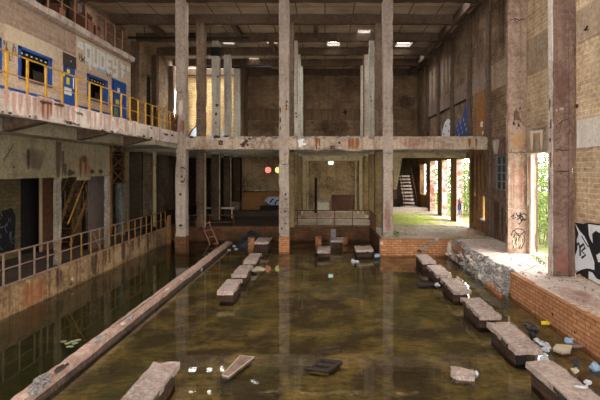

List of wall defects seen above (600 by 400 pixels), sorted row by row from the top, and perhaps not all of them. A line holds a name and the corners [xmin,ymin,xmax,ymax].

rust [37,95,54,122]
rust [346,136,361,151]
peeling [510,99,564,152]
spalling [446,239,527,300]
rust [16,274,50,316]